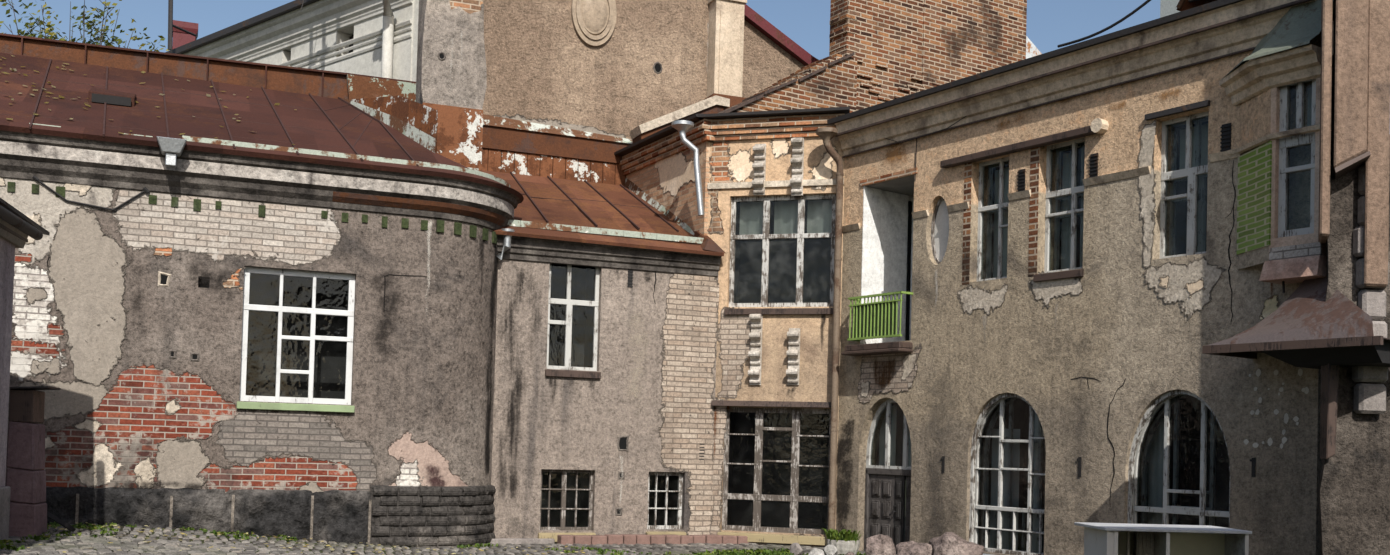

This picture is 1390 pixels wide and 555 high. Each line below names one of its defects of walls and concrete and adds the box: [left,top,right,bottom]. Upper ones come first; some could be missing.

flaking render [0,177,341,290]
flaking render [654,141,754,235]
peeling [770,138,792,159]
peeling [808,146,838,191]
peeling [1138,118,1227,319]
peeling [957,282,1008,316]
peeling [1028,271,1083,308]
flaking render [11,322,66,358]
damp [480,239,524,495]
flaking render [858,343,922,404]
flaking render [43,364,470,494]